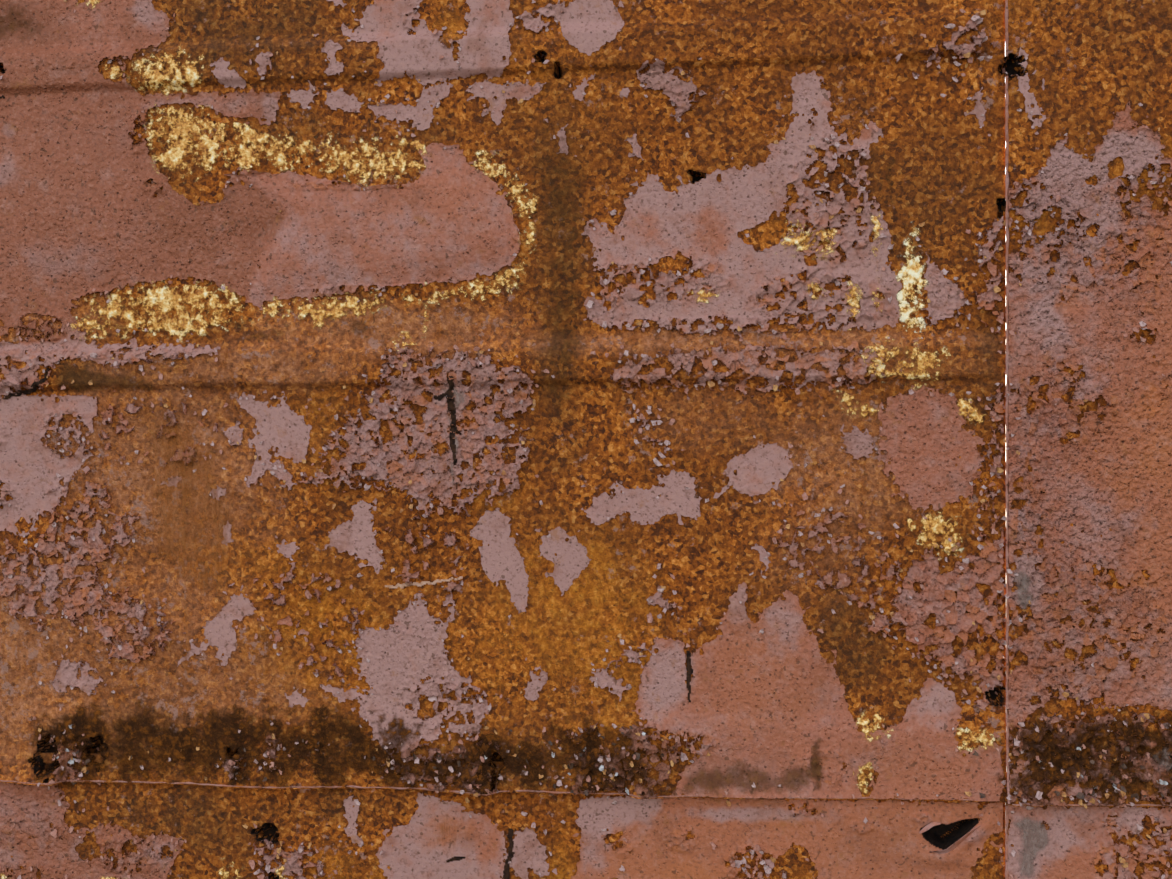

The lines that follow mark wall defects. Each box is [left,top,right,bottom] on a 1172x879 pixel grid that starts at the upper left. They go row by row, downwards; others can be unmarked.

peeling [912,9,999,82]
corrosion [105,46,427,184]
corrosion [392,150,537,351]
corrosion [70,281,384,340]
corrosion [861,228,951,389]
peeling [0,0,624,879]
peeling [535,58,1172,879]
corrosion [957,398,985,423]
corrosion [907,512,963,560]
corrosion [30,699,676,796]
corrosion [856,713,893,742]
corrosion [999,709,1172,807]